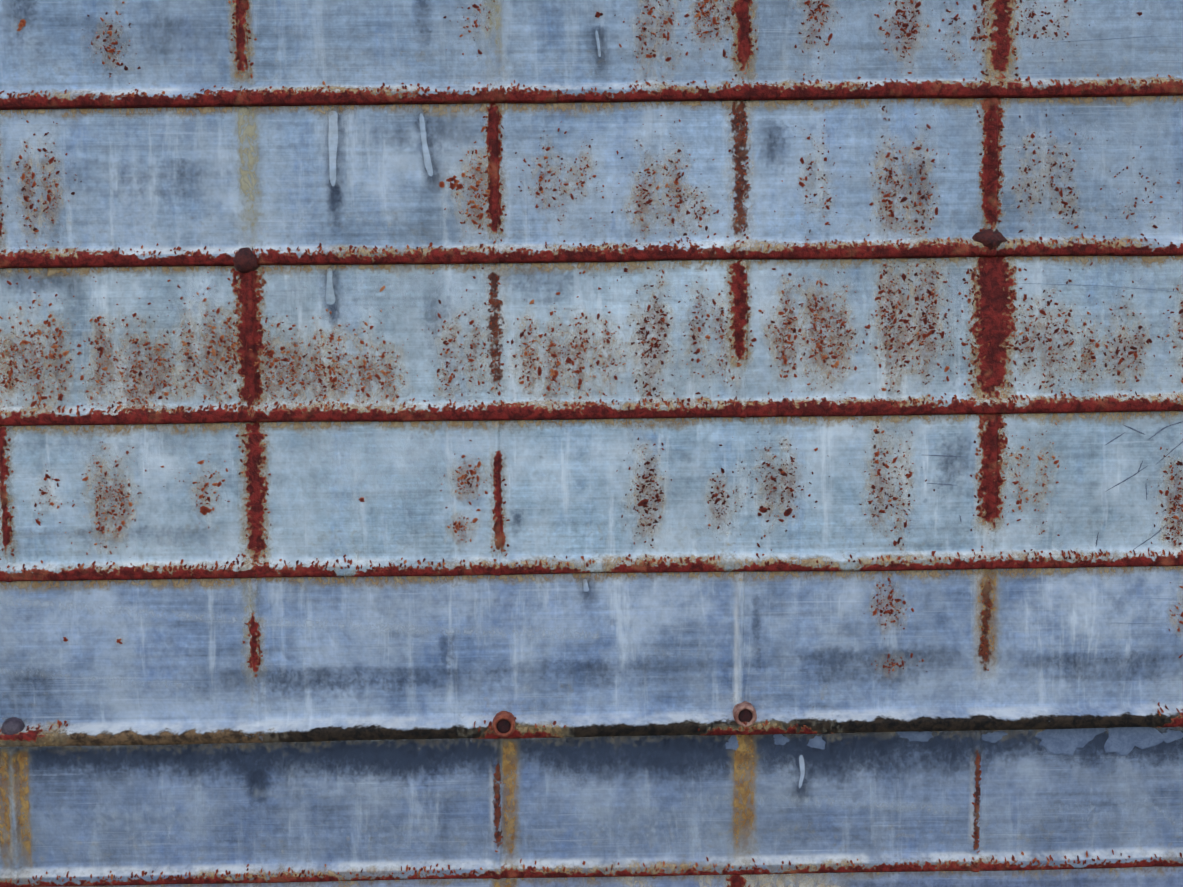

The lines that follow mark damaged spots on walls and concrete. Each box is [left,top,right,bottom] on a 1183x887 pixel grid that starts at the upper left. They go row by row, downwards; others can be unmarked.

corrosion [1156,702,1183,728]
corrosion [0,717,1183,887]